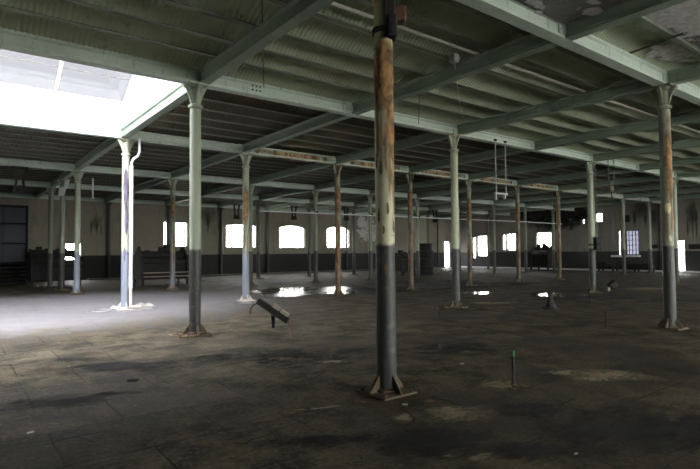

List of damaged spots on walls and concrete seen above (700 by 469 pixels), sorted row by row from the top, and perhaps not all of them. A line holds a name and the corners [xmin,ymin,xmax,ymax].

peeling [573,0,604,17]
peeling [643,0,700,63]
rust [350,33,399,205]
rust [255,149,326,163]
rust [665,117,673,238]